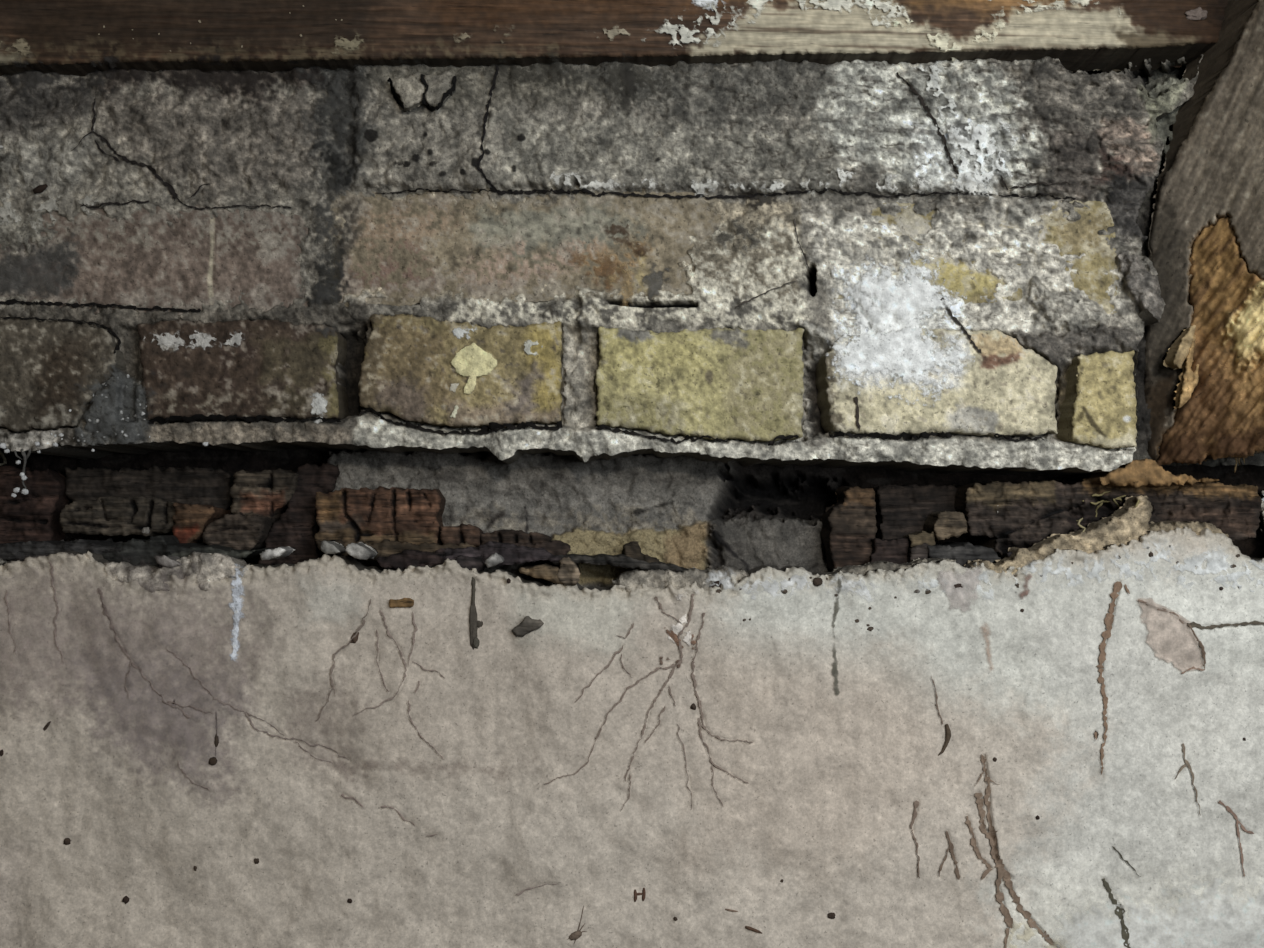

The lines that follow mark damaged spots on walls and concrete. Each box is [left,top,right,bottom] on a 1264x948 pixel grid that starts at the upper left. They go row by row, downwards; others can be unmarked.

crack [71,98,291,210]
crack [377,65,1076,308]
spalling [104,546,295,593]
leakage [229,564,245,661]
spalling [320,540,378,560]
spalling [485,552,504,568]
spalling [612,565,749,593]
spalling [809,495,1229,612]
crack [97,588,445,764]
crack [545,594,753,810]
crack [341,794,438,837]
crack [1175,743,1254,877]